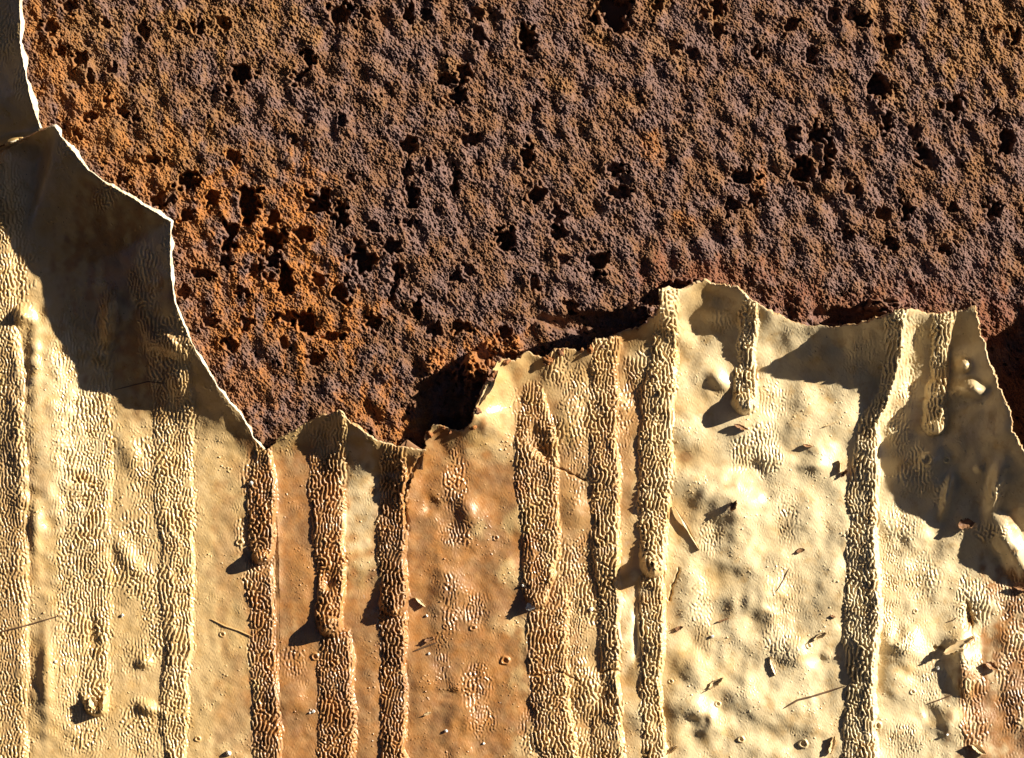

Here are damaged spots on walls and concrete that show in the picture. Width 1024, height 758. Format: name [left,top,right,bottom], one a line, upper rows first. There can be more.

spalling [519,136,611,282]
rust [751,130,769,198]
spalling [784,118,837,199]
spalling [865,64,935,171]
rust [876,0,1024,116]
spalling [938,93,1017,155]
peeling [0,0,434,758]
rust [19,0,590,758]
rust [616,210,1024,563]
rust [554,428,596,603]
peeling [429,278,1024,758]
rust [944,548,1024,758]